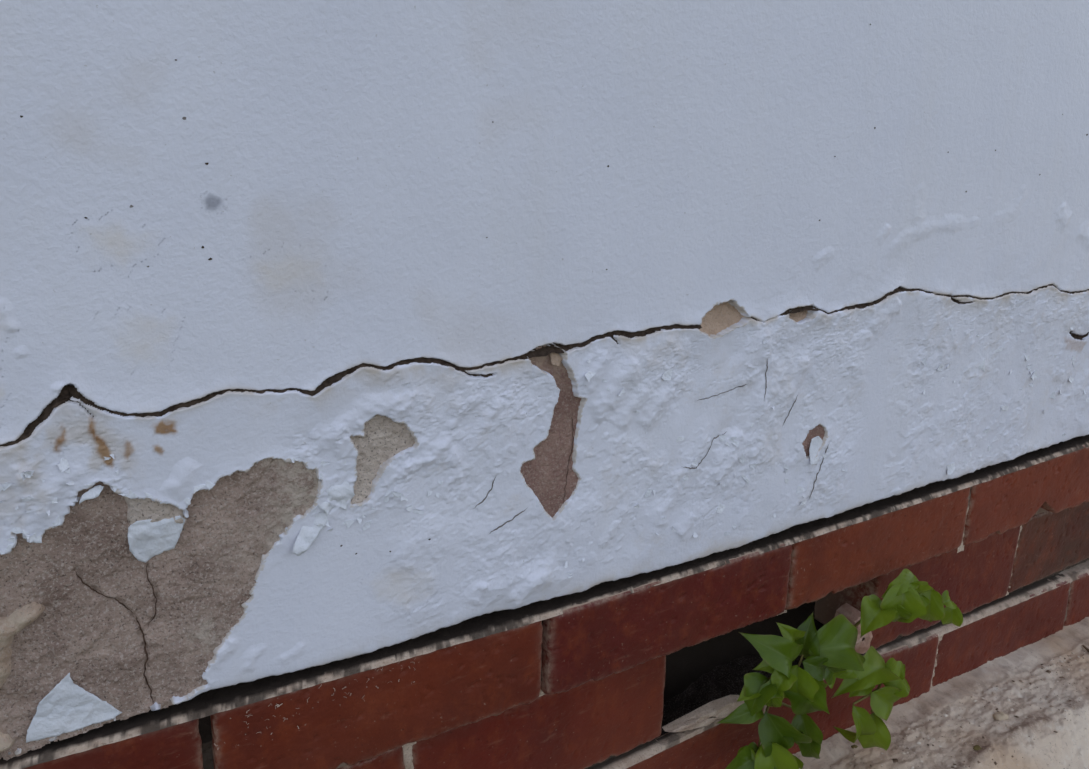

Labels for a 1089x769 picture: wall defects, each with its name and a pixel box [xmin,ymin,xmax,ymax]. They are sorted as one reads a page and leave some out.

spalling [699,302,744,336]
crack [751,284,1089,321]
crack [0,324,702,446]
crack [699,359,768,400]
peeling [520,345,581,518]
peeling [802,425,825,465]
spalling [0,414,415,760]
spalling [657,655,772,738]